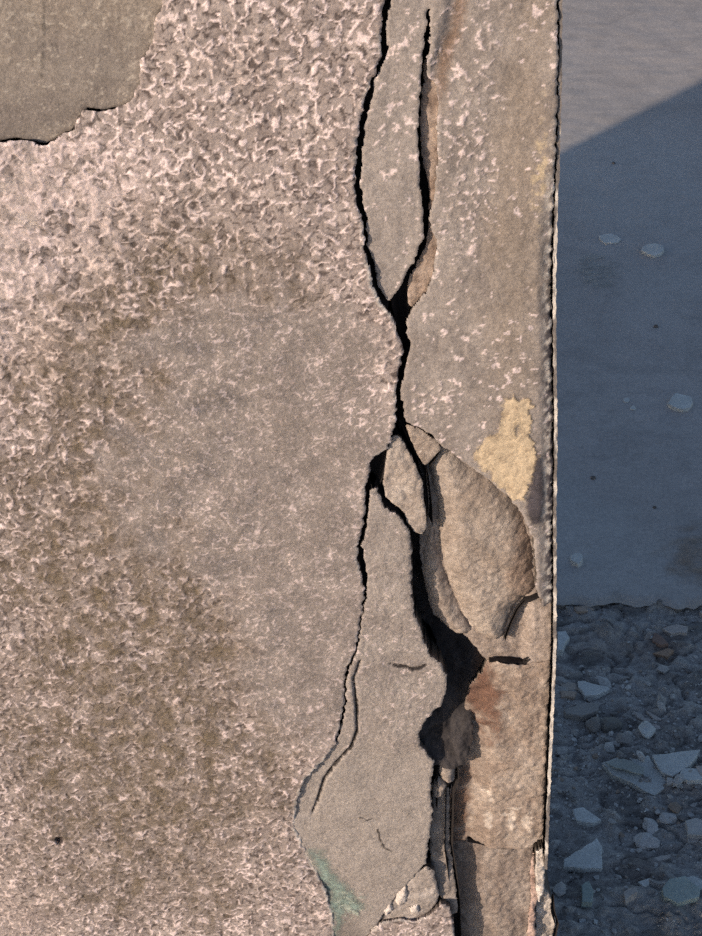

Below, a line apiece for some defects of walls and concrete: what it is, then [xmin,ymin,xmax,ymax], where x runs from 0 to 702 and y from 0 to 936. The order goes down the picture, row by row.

spalling [0,0,162,143]
crack [312,0,441,812]
crack [420,764,485,936]
spalling [371,397,610,936]
crack [489,82,558,849]